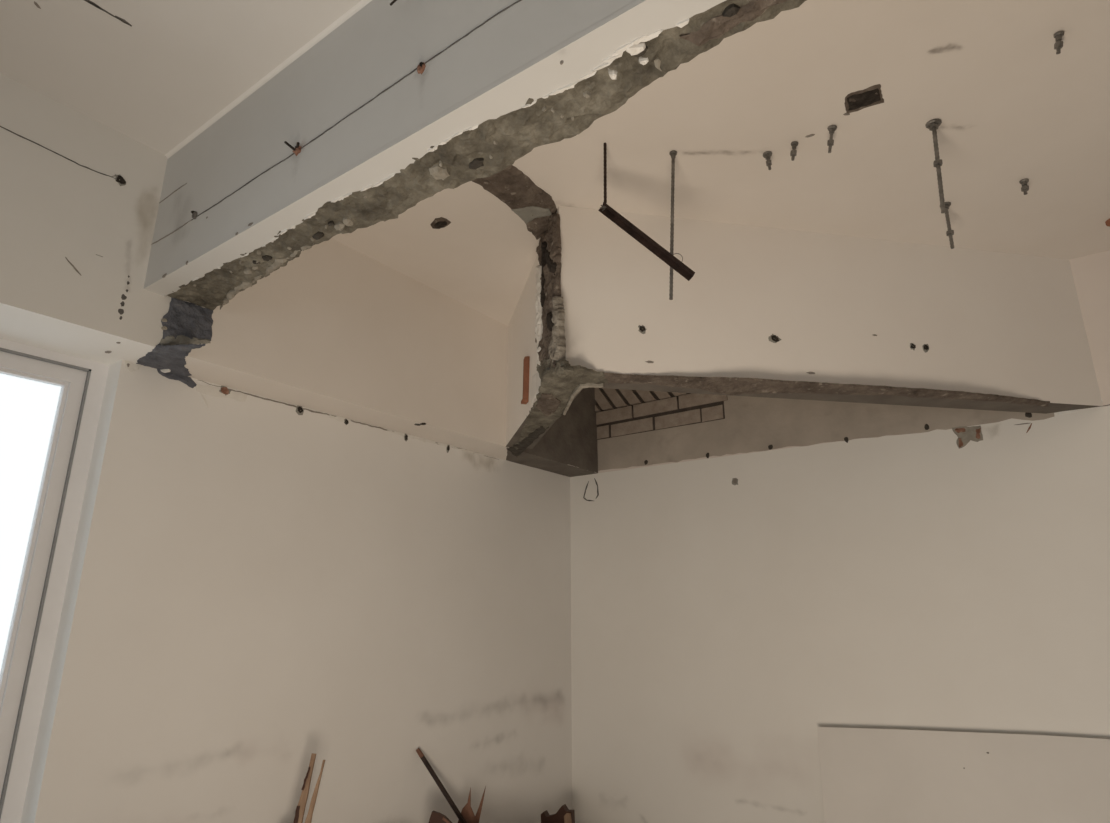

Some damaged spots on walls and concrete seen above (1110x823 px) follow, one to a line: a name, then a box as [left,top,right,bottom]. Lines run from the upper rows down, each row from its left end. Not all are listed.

spalling [167,0,806,310]
spalling [844,84,884,113]
peeling [506,213,1081,477]